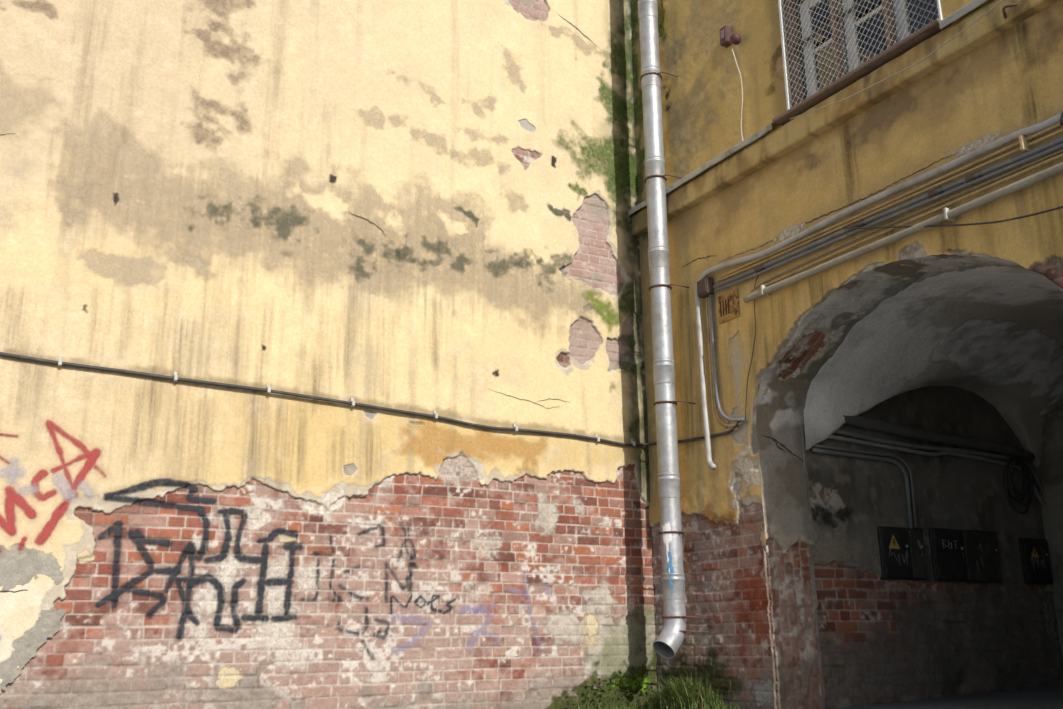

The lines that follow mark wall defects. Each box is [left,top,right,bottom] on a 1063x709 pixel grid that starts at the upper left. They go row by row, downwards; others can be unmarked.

water stain [198,0,240,58]
flaking render [509,0,590,54]
water stain [195,123,219,143]
water stain [197,98,248,130]
peeling [59,120,642,371]
flaking render [1014,258,1063,288]
peeling [930,319,1063,415]
flaking render [0,453,1063,709]